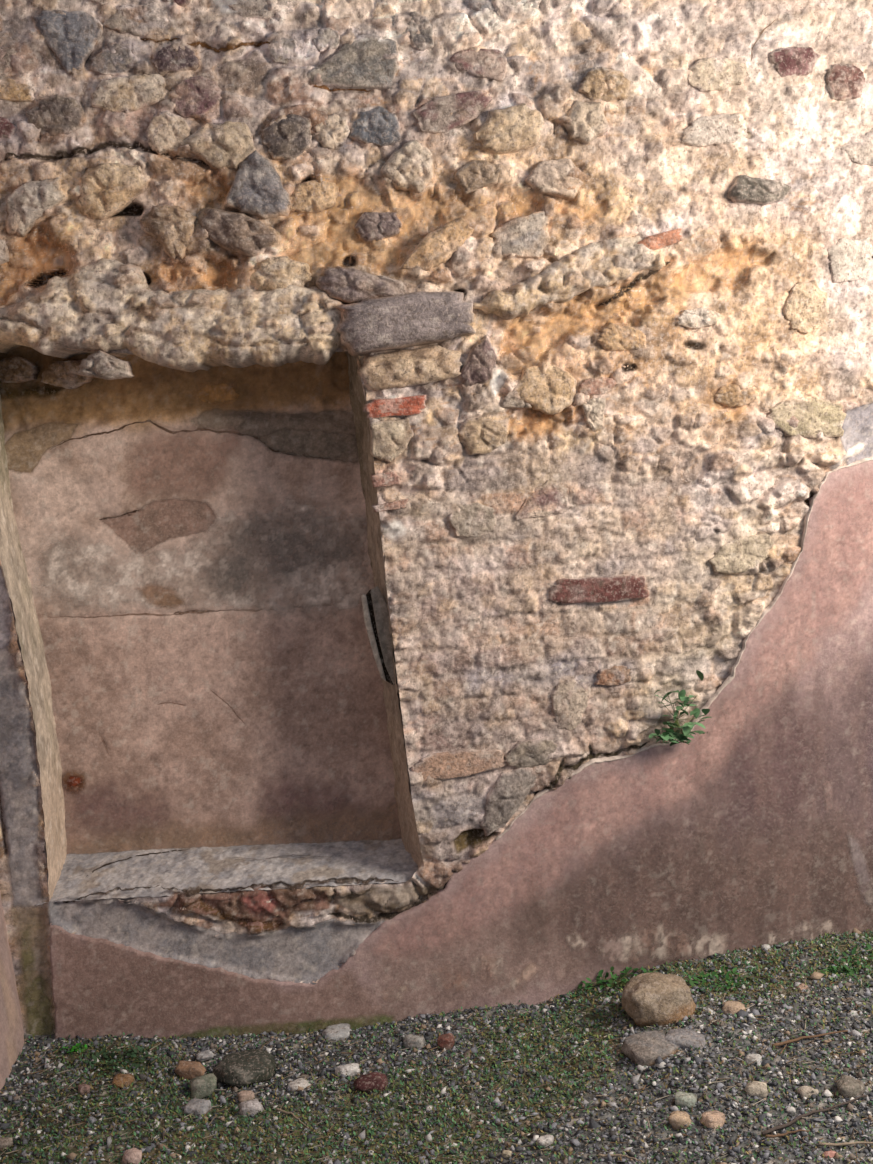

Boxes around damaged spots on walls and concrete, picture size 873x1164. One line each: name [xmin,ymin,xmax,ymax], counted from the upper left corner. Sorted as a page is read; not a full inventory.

crack [4,141,216,171]
spalling [4,423,78,472]
spalling [191,409,358,463]
spalling [831,403,873,470]
spalling [102,499,216,555]
crack [61,603,358,618]
spalling [0,568,443,985]
damp [527,682,873,966]